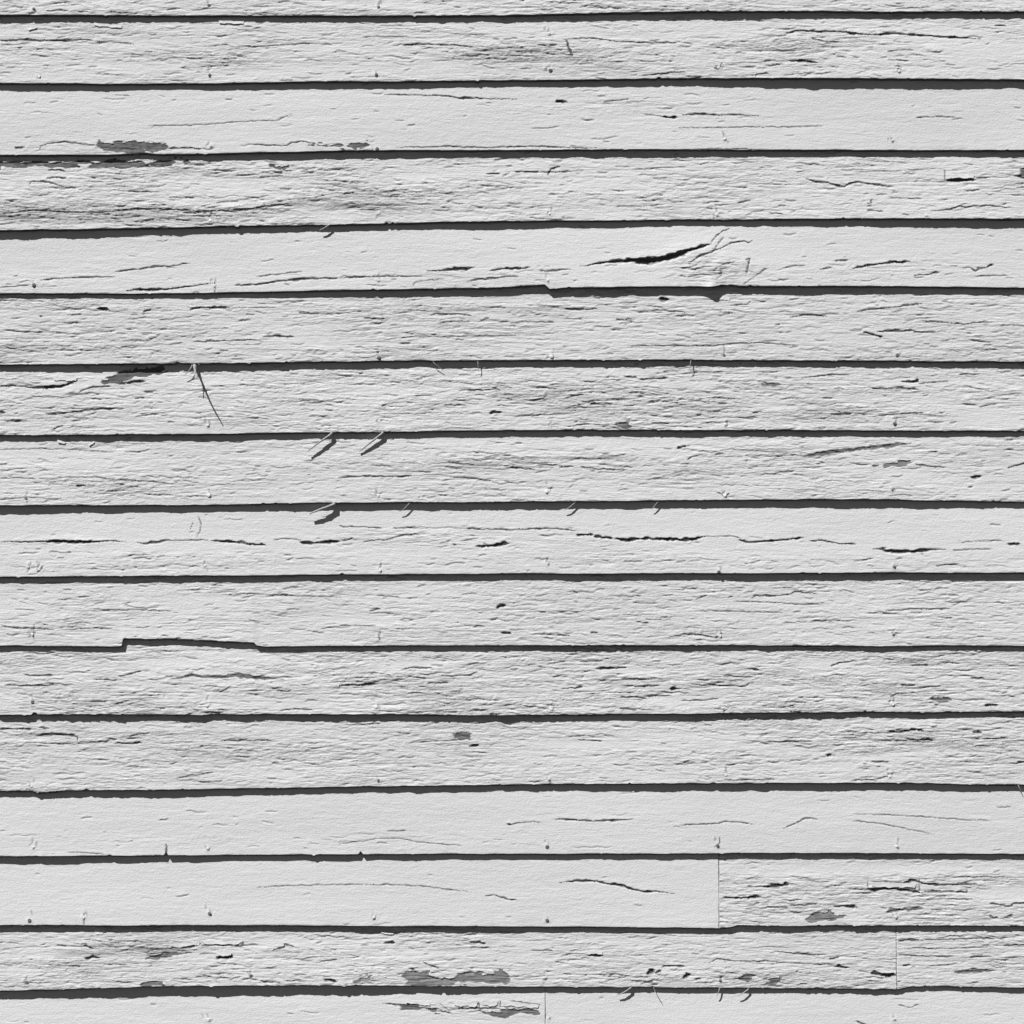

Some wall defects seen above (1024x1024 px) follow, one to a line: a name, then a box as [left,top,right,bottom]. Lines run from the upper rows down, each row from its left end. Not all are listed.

peeling [0,140,191,170]
crack [0,228,939,347]
peeling [102,365,168,385]
crack [4,516,415,572]
crack [441,528,1002,566]
peeling [453,730,479,747]
crack [559,880,674,894]
peeling [806,910,847,923]
peeling [402,967,510,987]
peeling [400,1001,540,1018]